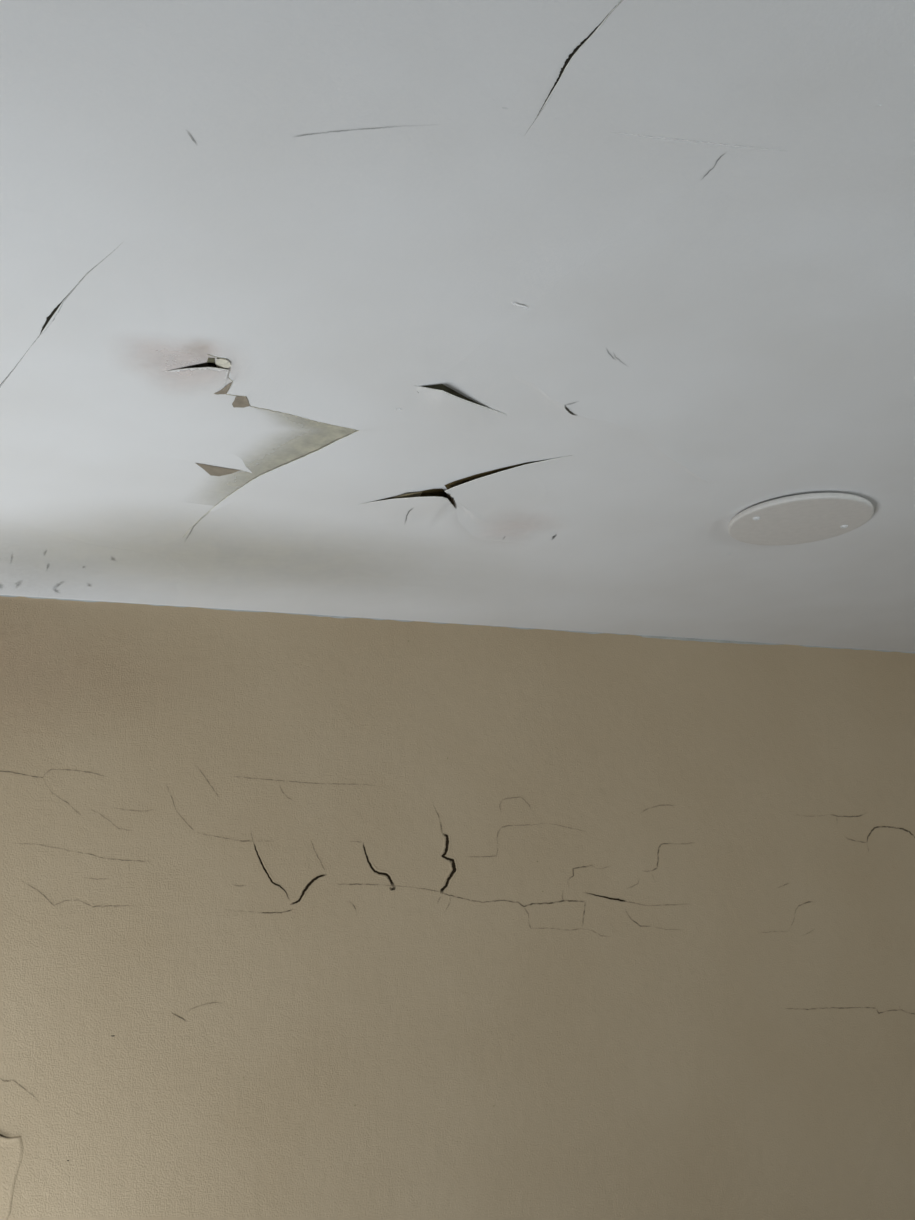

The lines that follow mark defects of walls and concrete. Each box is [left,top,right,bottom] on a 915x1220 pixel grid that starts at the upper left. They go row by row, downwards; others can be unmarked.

peeling [511,303,722,488]